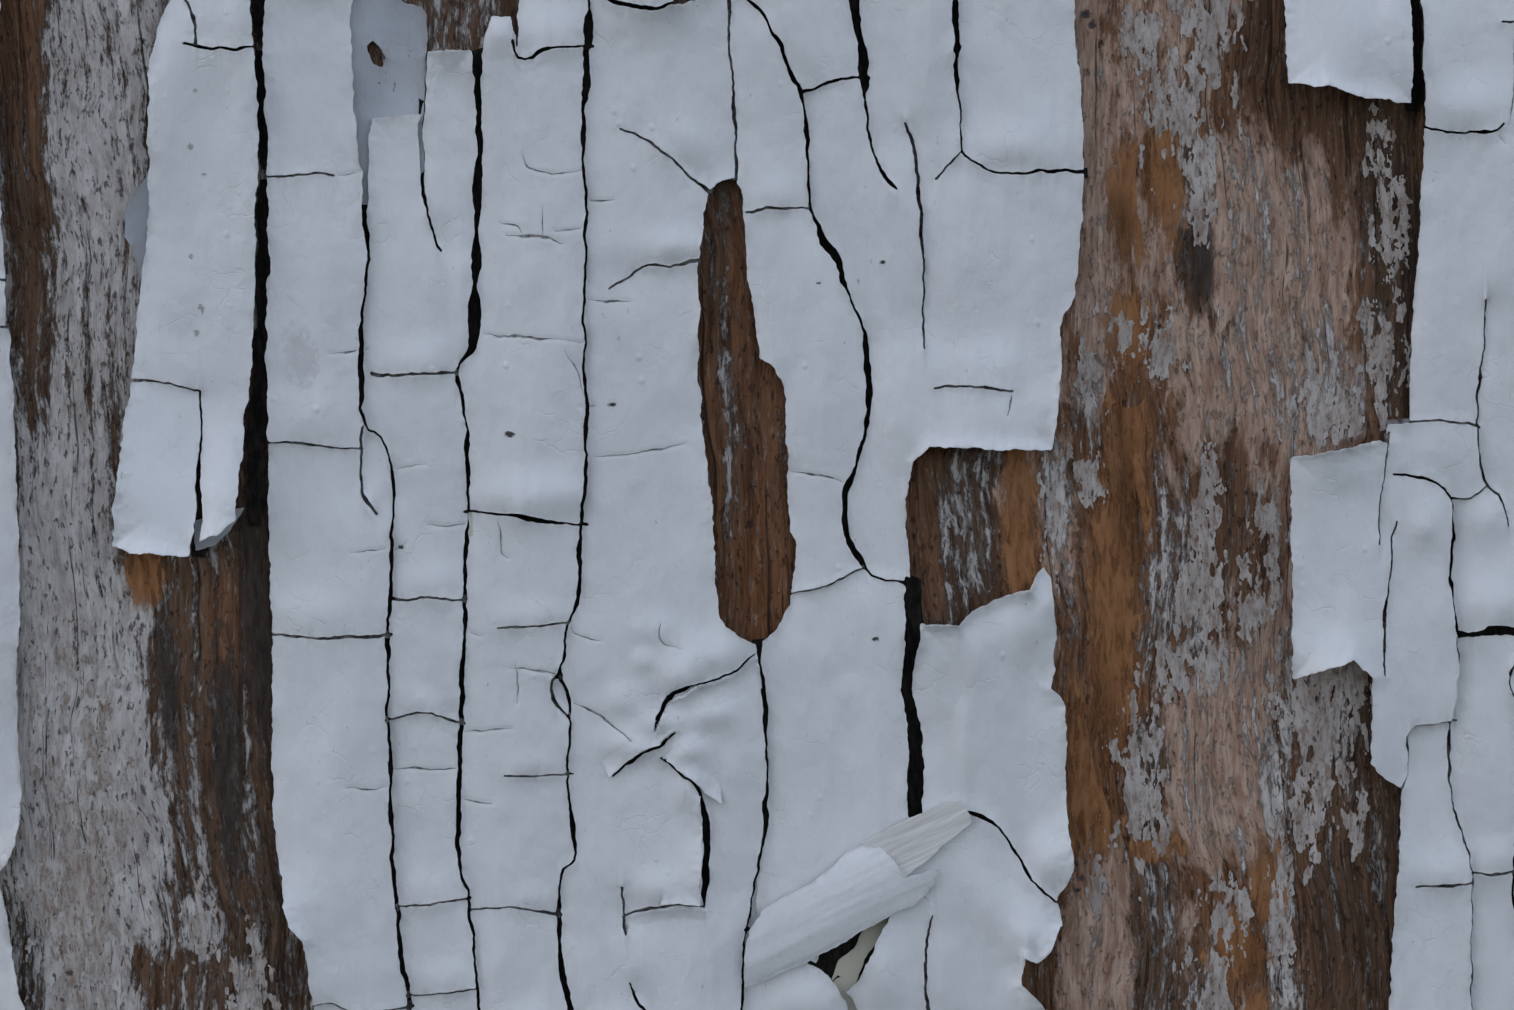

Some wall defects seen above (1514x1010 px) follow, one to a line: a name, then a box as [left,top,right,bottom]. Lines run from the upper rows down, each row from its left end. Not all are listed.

crack [1405,0,1514,142]
crack [134,378,208,558]
peeling [0,0,588,1010]
crack [183,0,1088,1010]
peeling [560,0,1514,1010]
crack [1378,300,1514,697]
crack [1400,719,1514,1006]